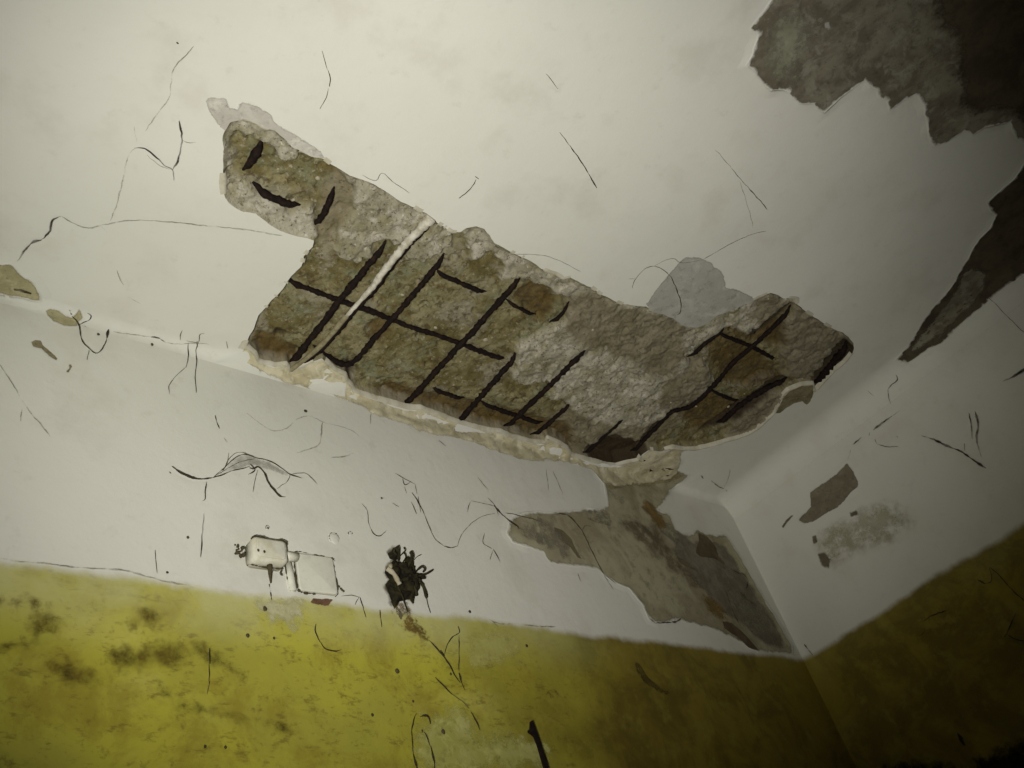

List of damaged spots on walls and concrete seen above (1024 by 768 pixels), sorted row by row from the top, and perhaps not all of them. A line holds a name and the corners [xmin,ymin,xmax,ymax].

peeling [737,0,1024,153]
crack [138,122,189,177]
crack [23,216,86,253]
flaking render [0,256,94,334]
spalling [206,98,864,660]
crack [924,412,985,468]